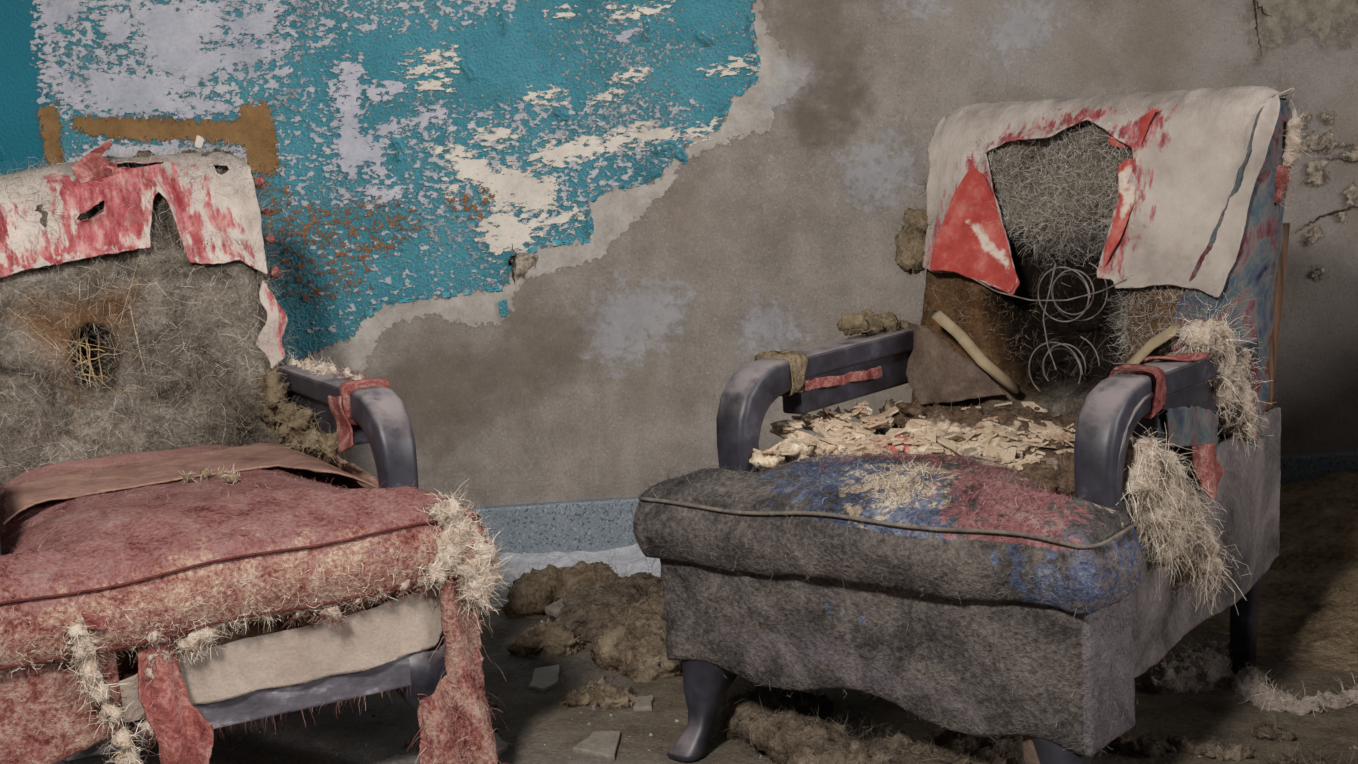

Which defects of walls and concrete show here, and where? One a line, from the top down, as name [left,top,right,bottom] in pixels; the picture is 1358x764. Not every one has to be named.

peeling [23,0,1358,507]
crack [1252,0,1270,50]